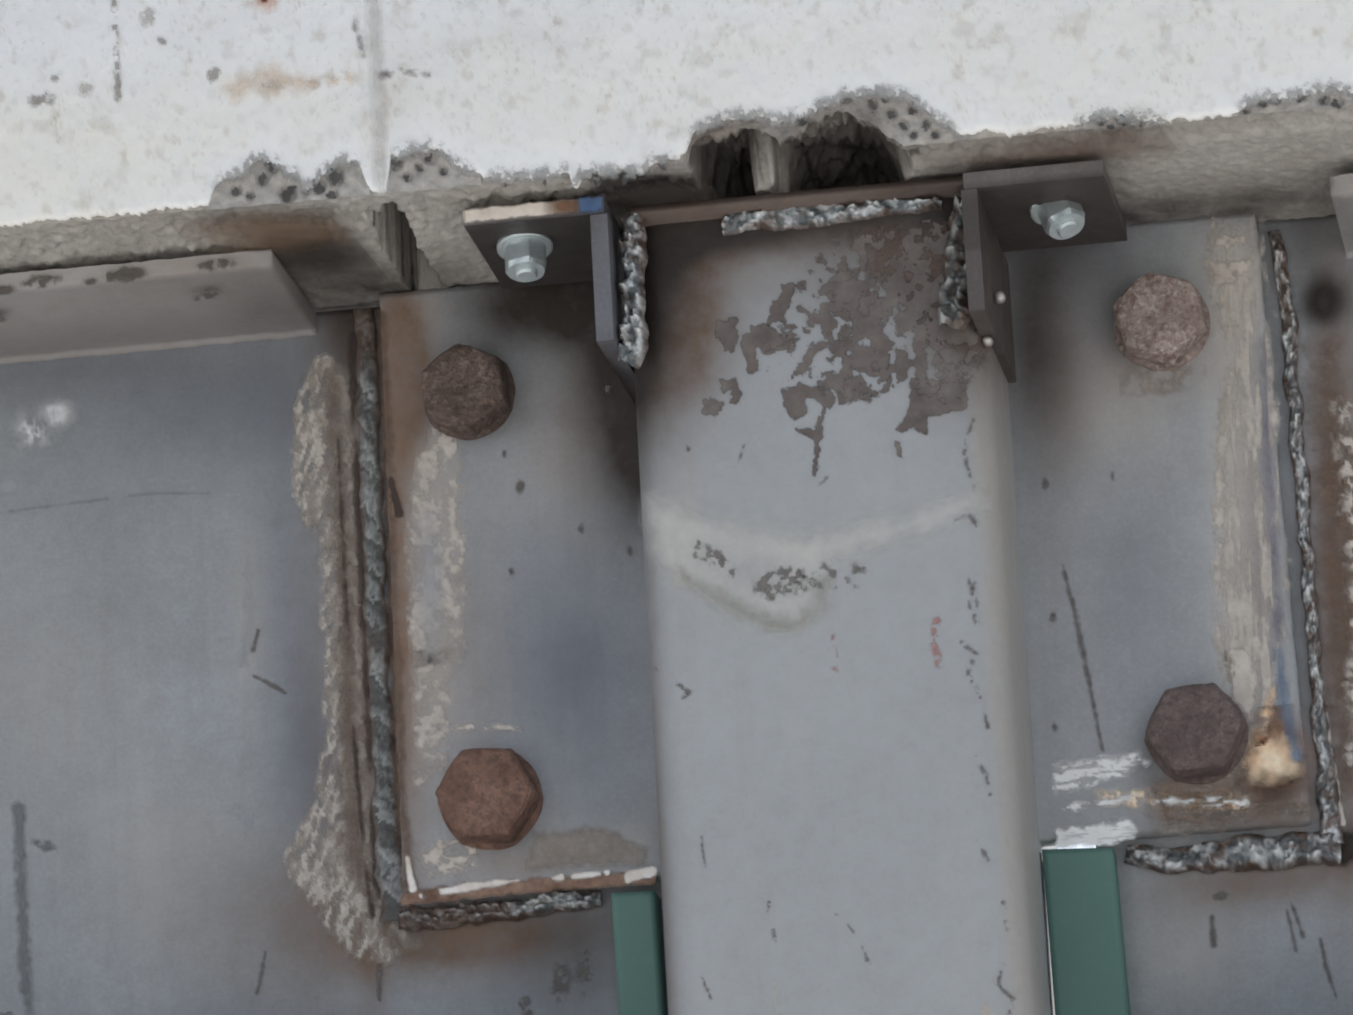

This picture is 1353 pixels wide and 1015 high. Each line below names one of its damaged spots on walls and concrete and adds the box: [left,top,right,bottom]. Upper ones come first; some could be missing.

spalling [388,85,965,193]
peeling [702,220,990,476]